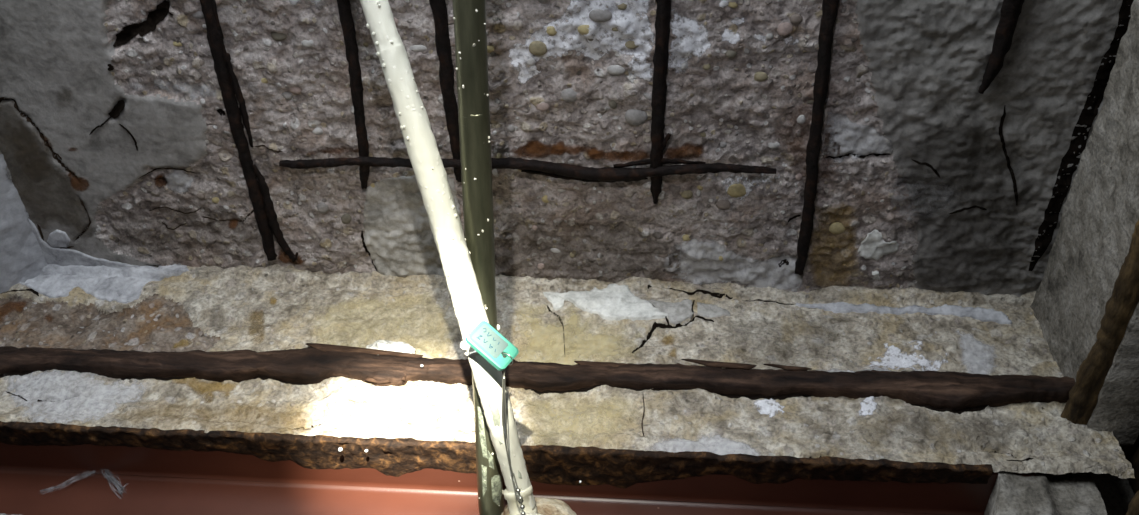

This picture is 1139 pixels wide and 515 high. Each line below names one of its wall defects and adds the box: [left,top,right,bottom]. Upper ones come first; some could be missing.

water stain [509,0,654,84]
water stain [668,9,744,73]
spalling [388,0,464,234]
crack [0,97,91,249]
spalling [0,0,445,354]
corrosion [512,133,706,182]
spalling [486,0,1012,324]
corrosion [305,343,423,358]
crack [632,285,815,353]
corrosion [662,337,812,371]
corrosion [174,376,233,402]